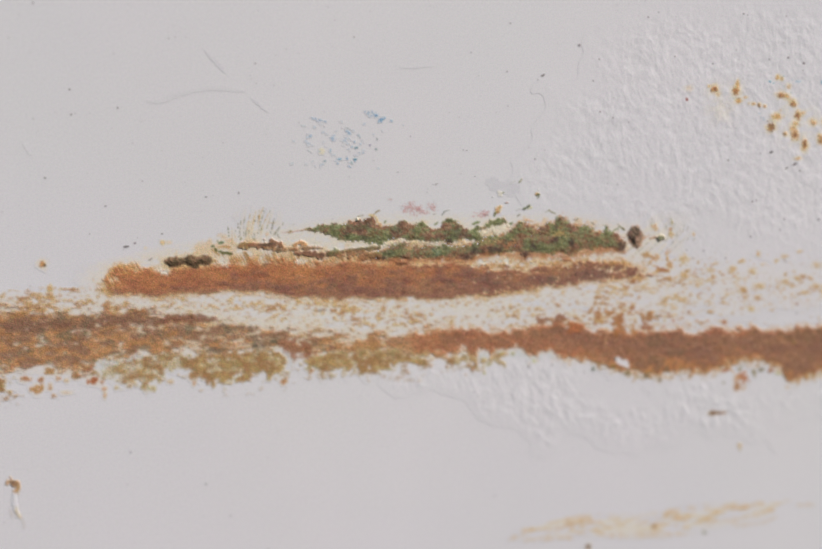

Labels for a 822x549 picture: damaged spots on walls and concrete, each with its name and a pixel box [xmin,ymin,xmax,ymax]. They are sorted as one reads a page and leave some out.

rust [682,73,822,161]
rust [0,209,822,402]